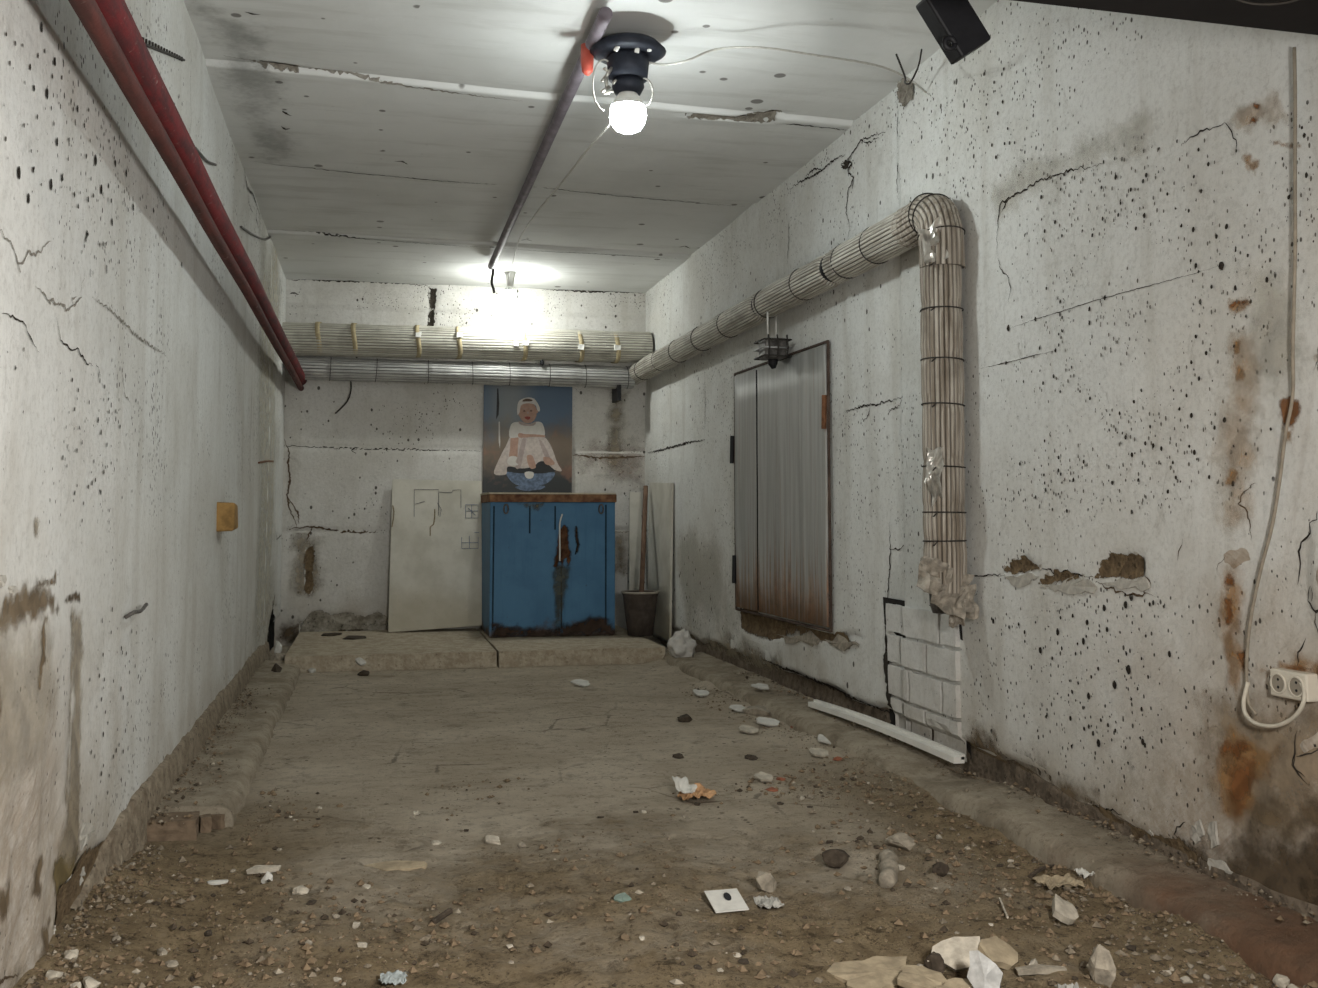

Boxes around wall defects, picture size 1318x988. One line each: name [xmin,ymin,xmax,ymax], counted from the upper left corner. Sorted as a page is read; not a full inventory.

crack [1182,123,1237,148]
spalling [1273,100,1318,242]
crack [1,229,165,400]
rust [1229,300,1249,312]
rust [1280,396,1300,439]
spalling [991,551,1165,755]
spalling [1112,651,1179,730]
rust [1220,575,1249,679]
water stain [0,572,83,896]
rust [1219,730,1268,814]
water stain [0,883,10,920]
water stain [42,919,50,957]